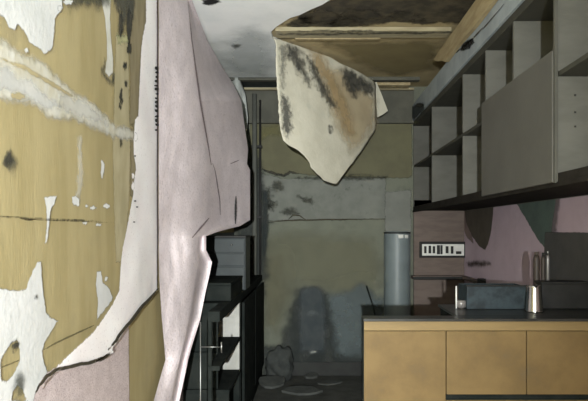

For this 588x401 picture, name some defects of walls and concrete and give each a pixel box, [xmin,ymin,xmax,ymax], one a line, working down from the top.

peeling [0,0,73,54]
water stain [72,0,135,53]
water stain [287,0,475,32]
water stain [280,44,375,143]
water stain [3,150,15,170]
crack [3,215,89,223]
peeling [96,272,113,319]
peeling [0,262,57,401]
water stain [282,286,384,362]